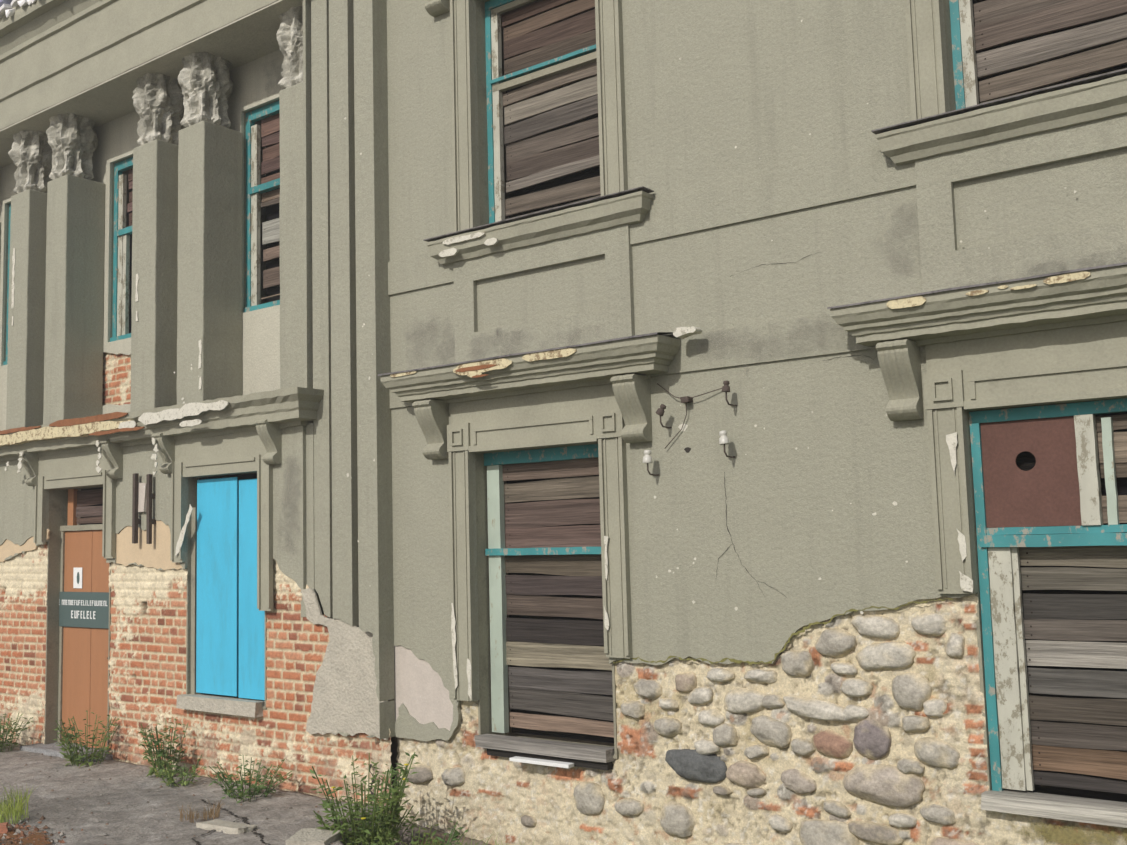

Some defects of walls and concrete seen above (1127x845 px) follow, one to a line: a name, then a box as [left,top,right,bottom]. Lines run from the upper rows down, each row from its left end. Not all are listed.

spalling [0,339,229,475]
flaking render [453,348,577,378]
flaking render [887,296,926,309]
peeling [946,432,958,475]
flaking render [966,271,1091,296]
crack [715,472,786,597]
flaking render [0,529,50,745]
flaking render [107,504,1127,845]